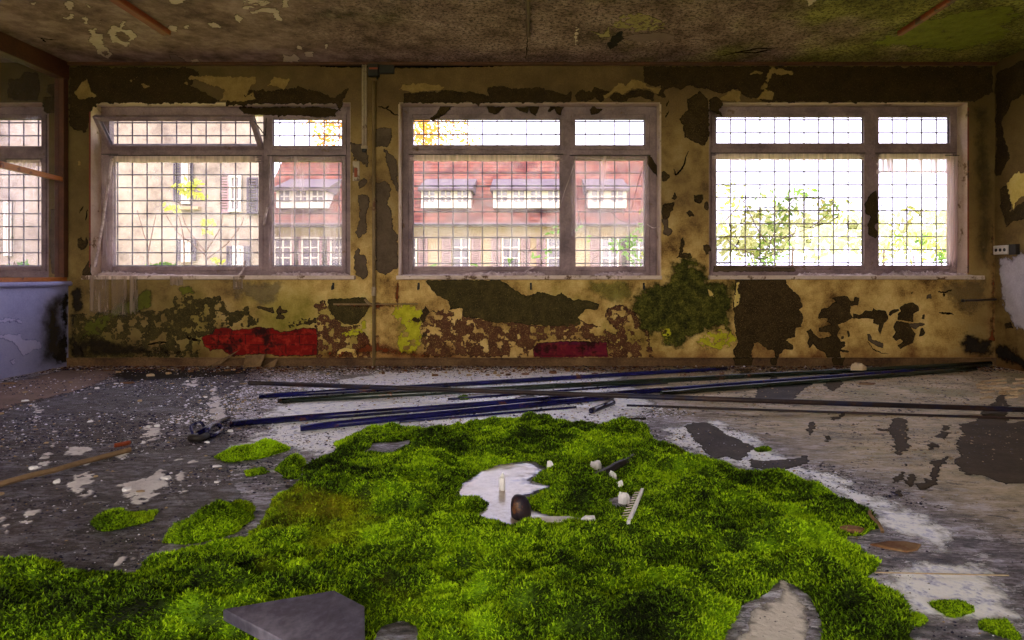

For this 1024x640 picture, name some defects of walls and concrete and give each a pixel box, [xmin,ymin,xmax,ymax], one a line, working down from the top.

peeling [62,0,349,133]
peeling [403,61,1024,227]
peeling [350,127,399,279]
peeling [661,192,692,258]
spalling [72,295,371,388]
peeling [412,279,654,376]
peeling [713,265,932,358]